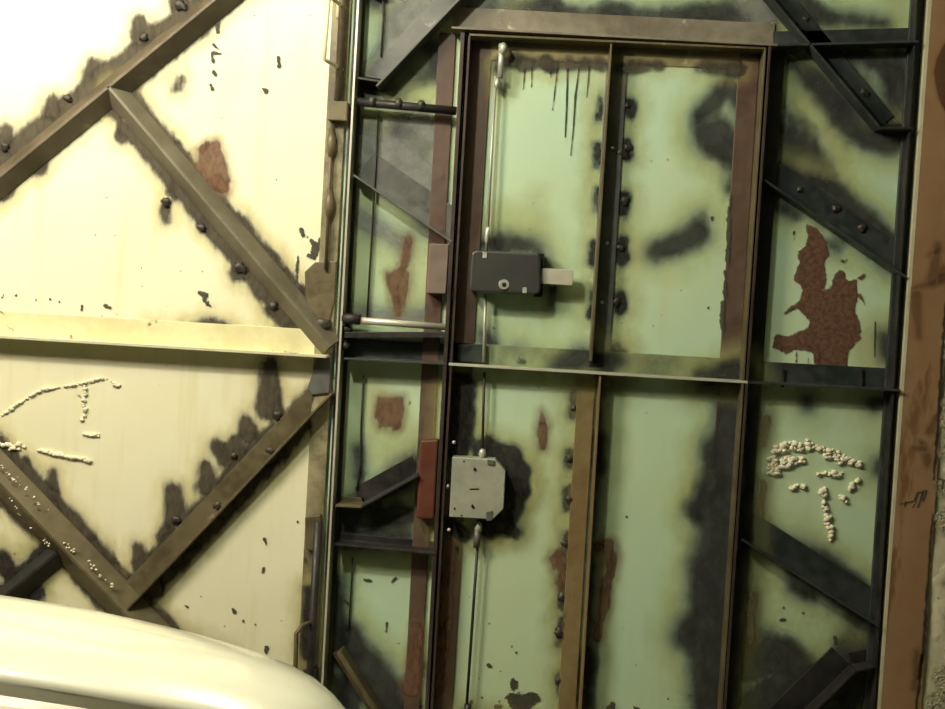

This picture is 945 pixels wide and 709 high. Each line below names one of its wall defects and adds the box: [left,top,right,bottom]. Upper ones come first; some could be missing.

rust [195,140,230,193]
rust [385,236,412,316]
rust [773,225,865,366]
rust [374,396,404,431]